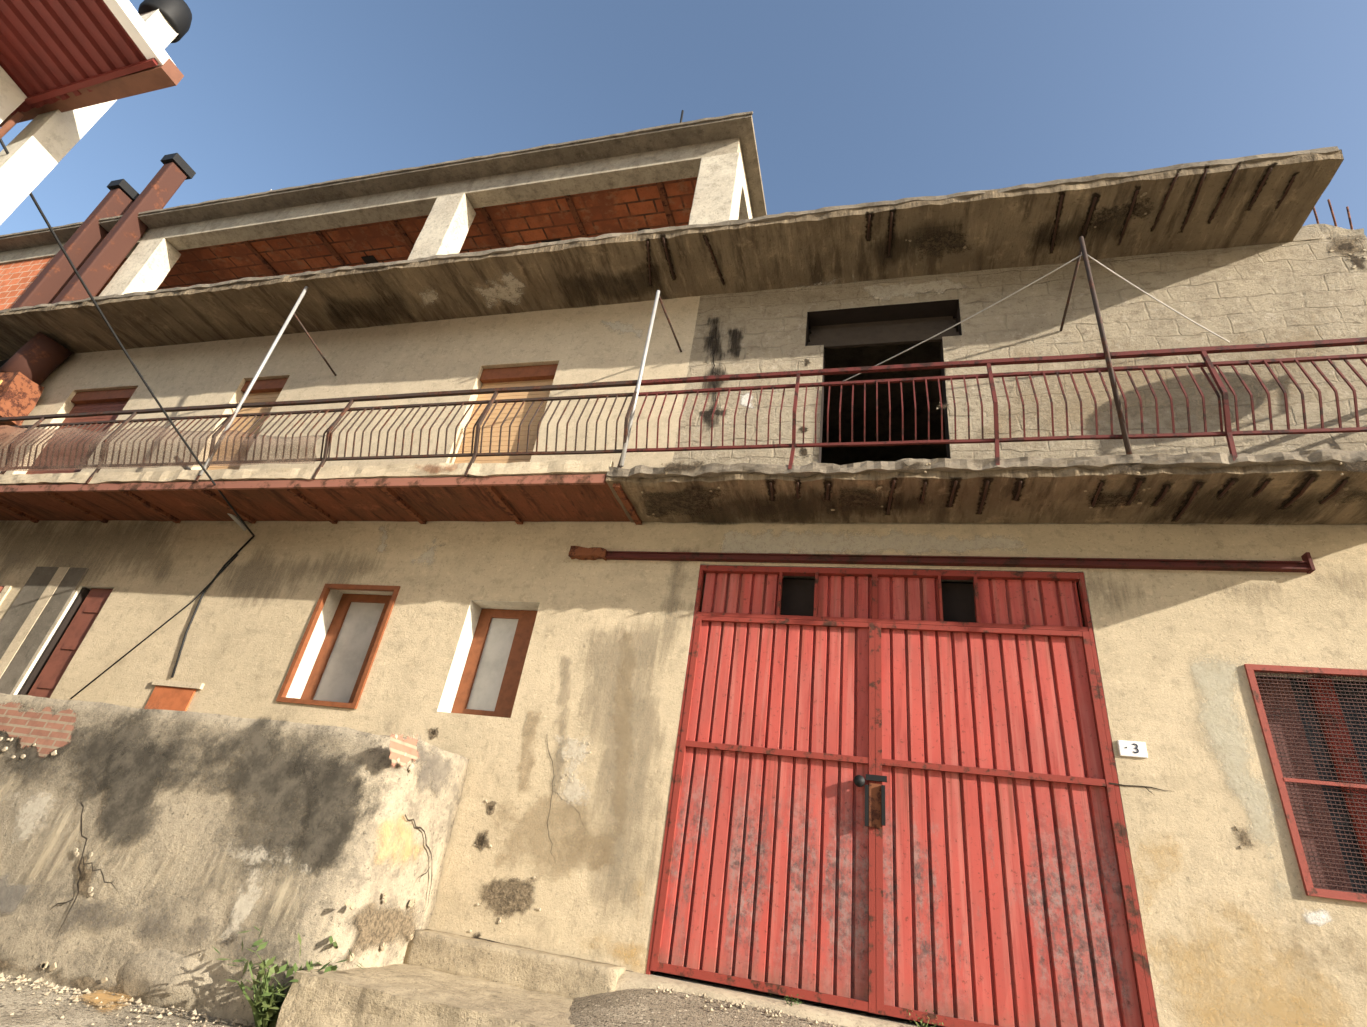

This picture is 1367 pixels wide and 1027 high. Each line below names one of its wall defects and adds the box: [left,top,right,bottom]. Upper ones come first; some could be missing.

damp [703,318,742,427]
flaking render [0,701,77,759]
flaking render [389,728,439,772]
crack [51,802,119,944]
damp [209,753,363,933]